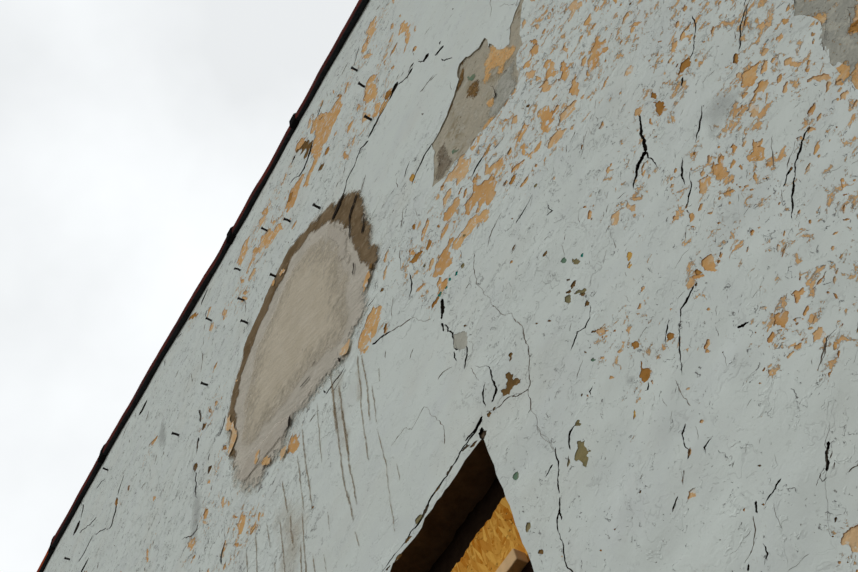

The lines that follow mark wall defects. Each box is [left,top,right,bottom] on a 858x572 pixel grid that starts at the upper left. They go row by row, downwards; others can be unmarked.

peeling [237,74,392,302]
peeling [409,0,609,310]
crack [603,116,657,217]
peeling [635,92,675,137]
crack [675,106,711,268]
peeling [685,133,770,228]
peeling [733,0,858,118]
crack [771,115,827,227]
peeling [760,246,843,359]
crack [368,168,576,572]
crack [638,286,711,542]
crack [806,429,858,537]